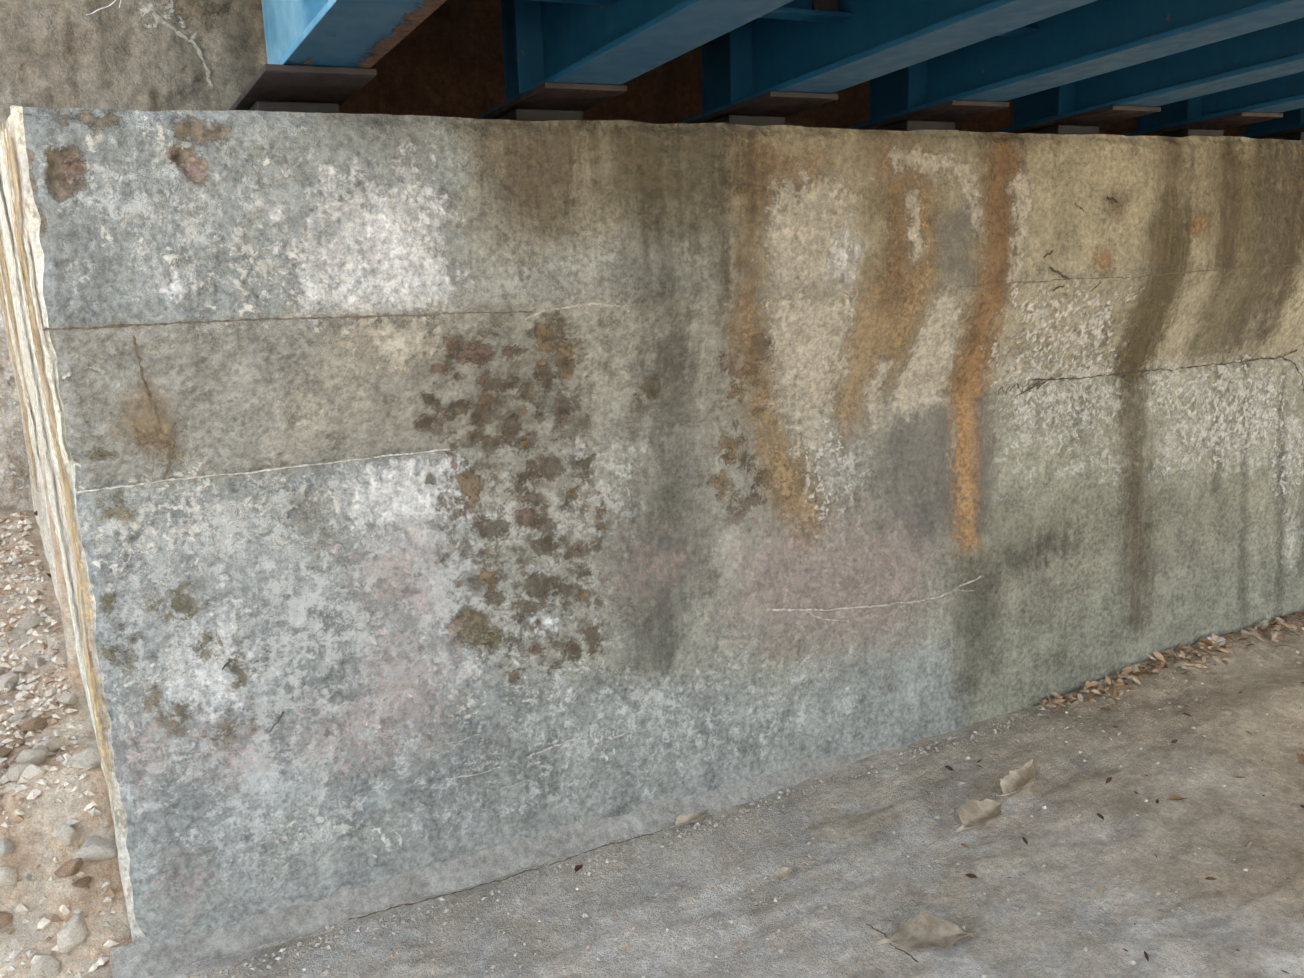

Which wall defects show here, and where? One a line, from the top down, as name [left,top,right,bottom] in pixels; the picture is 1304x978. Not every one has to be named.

corrosion [0,121,112,791]
corrosion [743,308,820,534]
corrosion [829,150,935,433]
efflorescence [889,145,984,263]
corrosion [950,139,1025,551]
water stain [982,136,1188,629]
crack [1034,350,1304,392]
water stain [1152,347,1304,497]
water stain [434,611,600,720]
water stain [262,806,402,868]